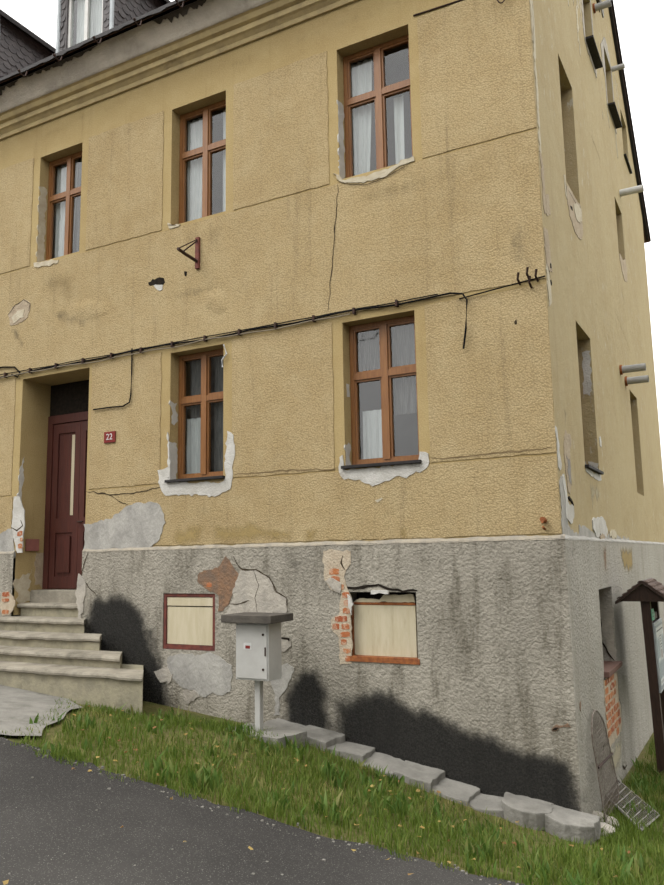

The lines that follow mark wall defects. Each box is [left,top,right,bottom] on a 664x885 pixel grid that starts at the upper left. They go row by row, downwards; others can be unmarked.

peeling [573,0,582,53]
flaking render [530,0,547,214]
spalling [564,175,583,240]
flaking render [555,426,574,524]
flaking render [592,516,617,539]
spalling [197,556,239,611]
flaking render [322,549,354,664]
spalling [599,587,617,661]
flaking render [603,672,622,747]